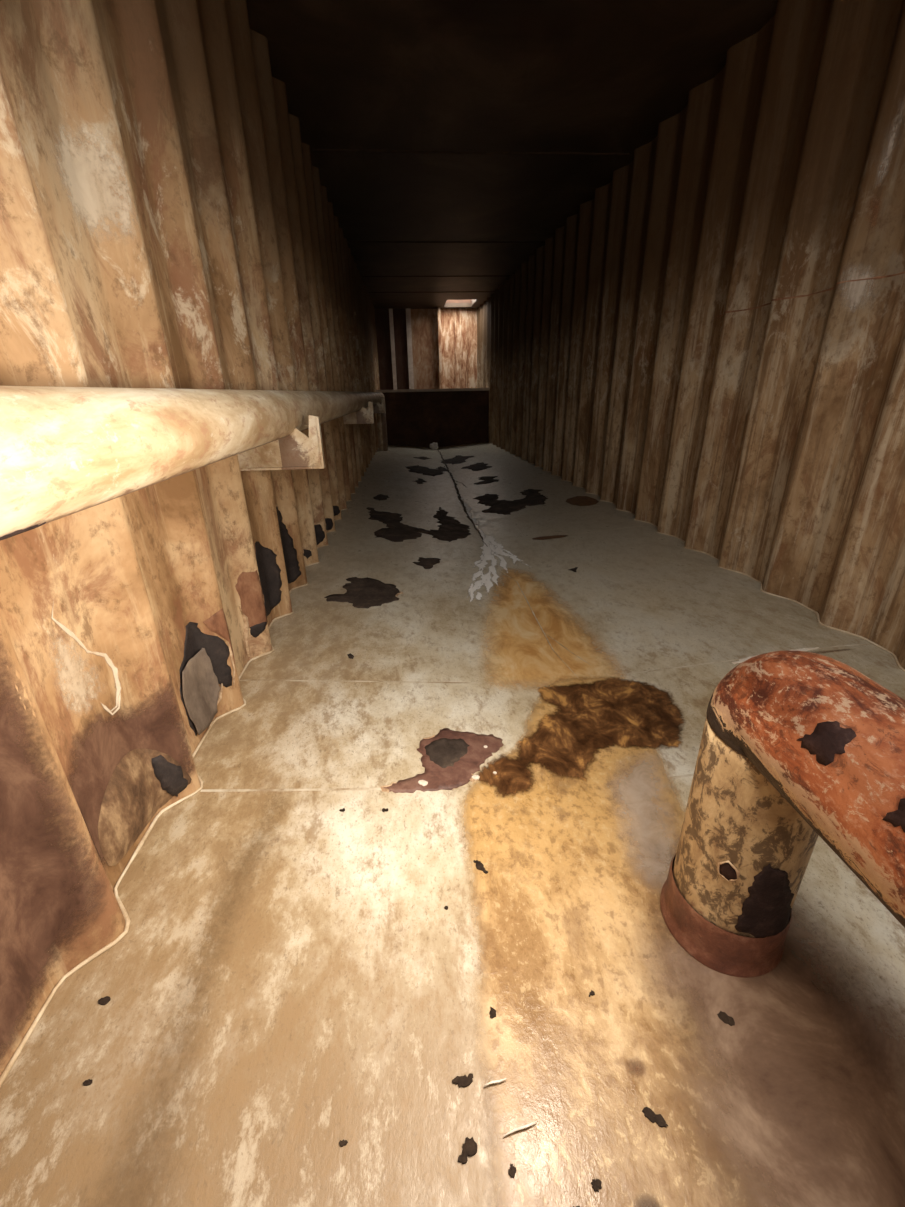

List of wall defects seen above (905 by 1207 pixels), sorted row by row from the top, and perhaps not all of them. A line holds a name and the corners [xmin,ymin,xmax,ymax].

peeling [179,504,340,736]
peeling [324,577,403,609]
peeling [366,494,471,542]
peeling [406,455,548,515]
crack [438,450,586,672]
corrosion [484,570,620,759]
peeling [380,728,504,793]
corrosion [463,745,756,1207]